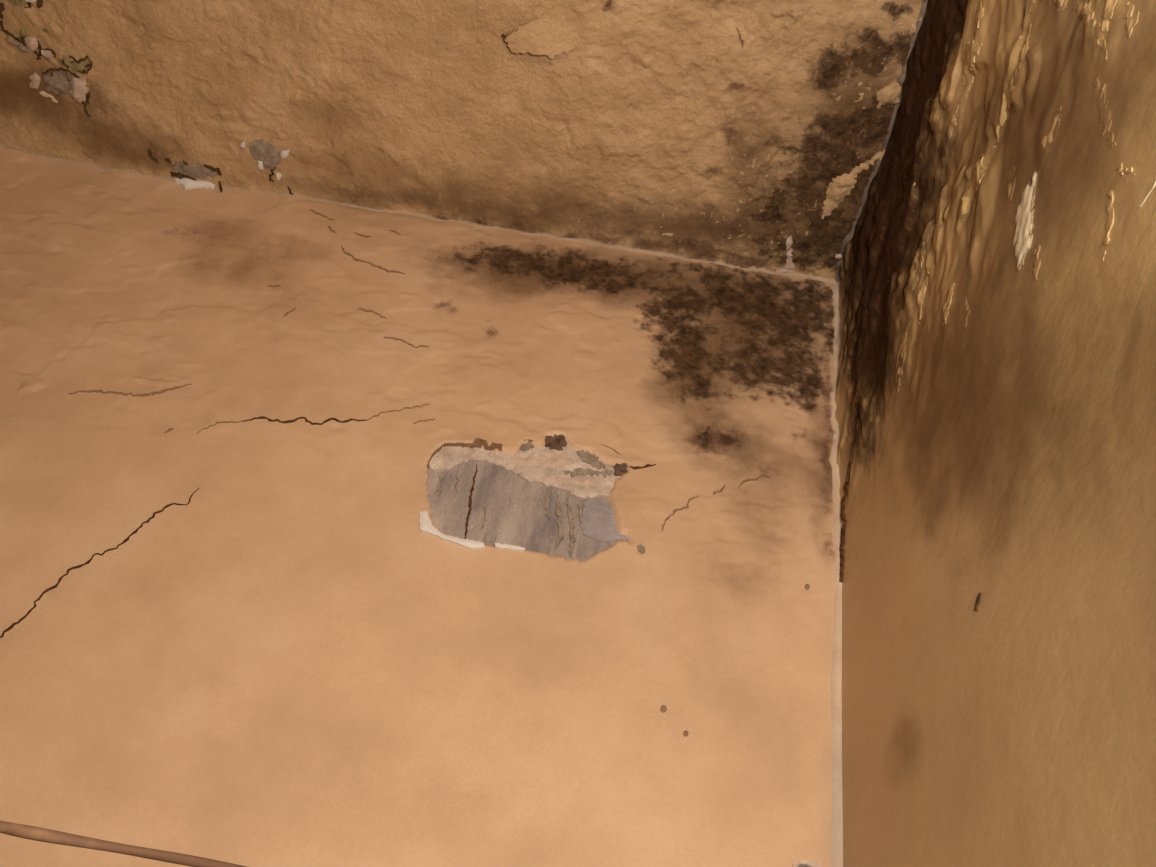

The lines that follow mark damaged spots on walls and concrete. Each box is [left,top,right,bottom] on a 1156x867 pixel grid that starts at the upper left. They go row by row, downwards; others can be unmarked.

peeling [0,0,92,117]
damp [452,0,968,464]
peeling [821,149,885,219]
peeling [1005,172,1041,280]
peeling [961,0,1139,221]
damp [986,35,1146,217]
crack [68,384,192,397]
crack [164,403,436,434]
damp [904,304,1042,491]
crack [0,488,199,638]
spalling [419,434,656,562]
crack [661,475,771,532]